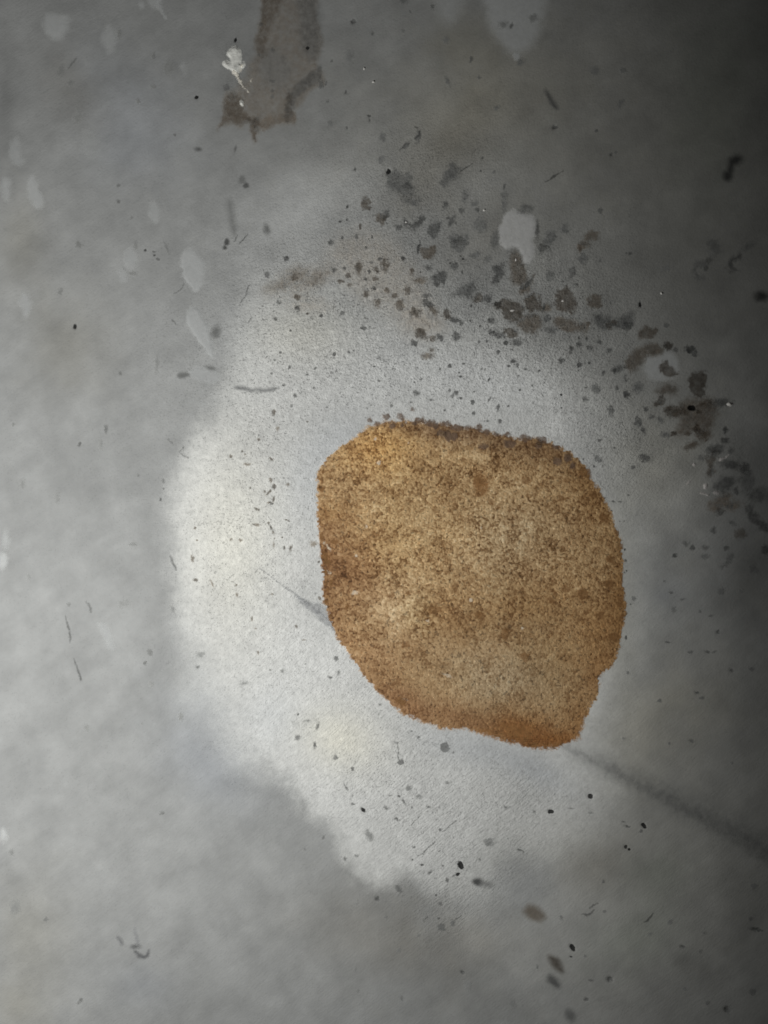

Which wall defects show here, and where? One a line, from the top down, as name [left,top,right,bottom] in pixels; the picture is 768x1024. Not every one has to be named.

damp [222,46,258,139]
damp [457,231,597,346]
corrosion [316,409,626,749]